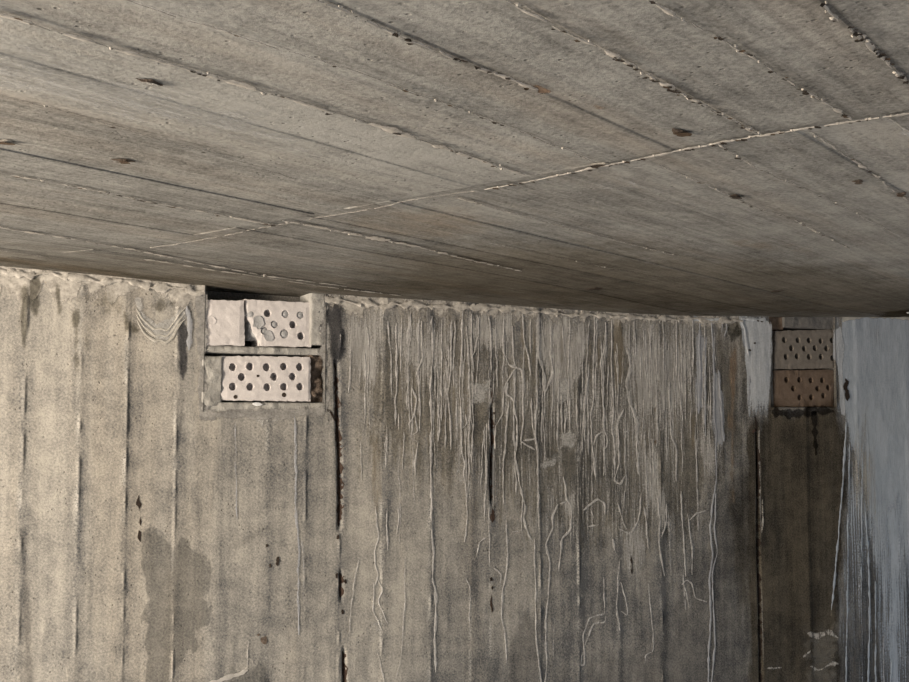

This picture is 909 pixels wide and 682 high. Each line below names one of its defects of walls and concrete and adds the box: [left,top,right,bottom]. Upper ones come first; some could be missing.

water stain [325,294,772,682]
water stain [807,312,909,682]